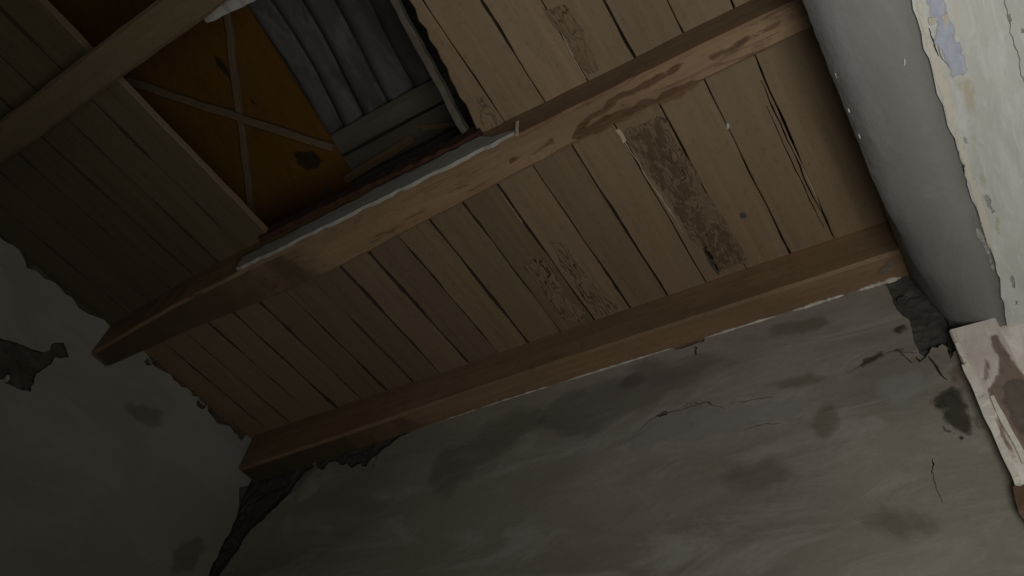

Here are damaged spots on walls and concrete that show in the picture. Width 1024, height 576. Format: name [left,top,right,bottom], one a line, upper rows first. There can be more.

peeling [917,0,995,256]
spalling [885,275,961,380]
spalling [0,338,69,392]
crack [632,397,780,434]
damp [935,387,970,440]
spalling [209,432,409,576]
crack [931,458,943,503]
flaking render [1013,485,1024,520]